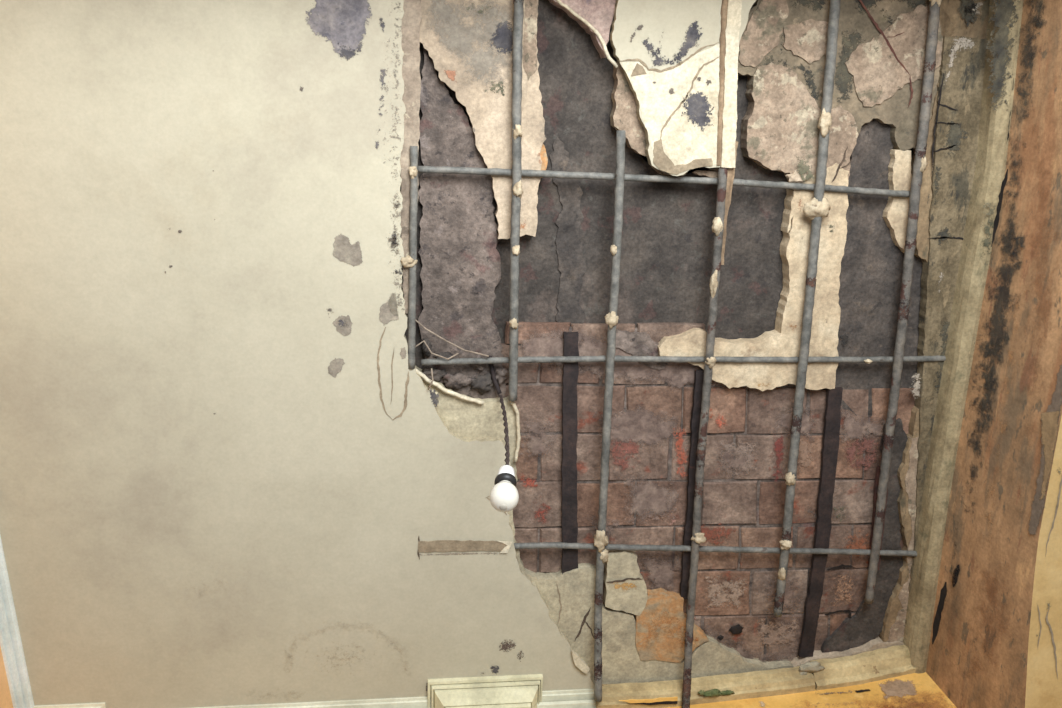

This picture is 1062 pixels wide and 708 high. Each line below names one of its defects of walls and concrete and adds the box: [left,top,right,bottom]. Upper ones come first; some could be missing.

damp [306,0,372,59]
damp [431,0,513,96]
damp [946,0,1046,119]
crack [377,327,409,420]
spalling [376,0,990,684]
damp [909,321,950,397]
damp [966,138,1024,512]
rust [791,412,803,435]
crack [1045,479,1062,557]
rust [594,661,602,681]
rust [682,668,692,704]
crack [1038,604,1058,677]